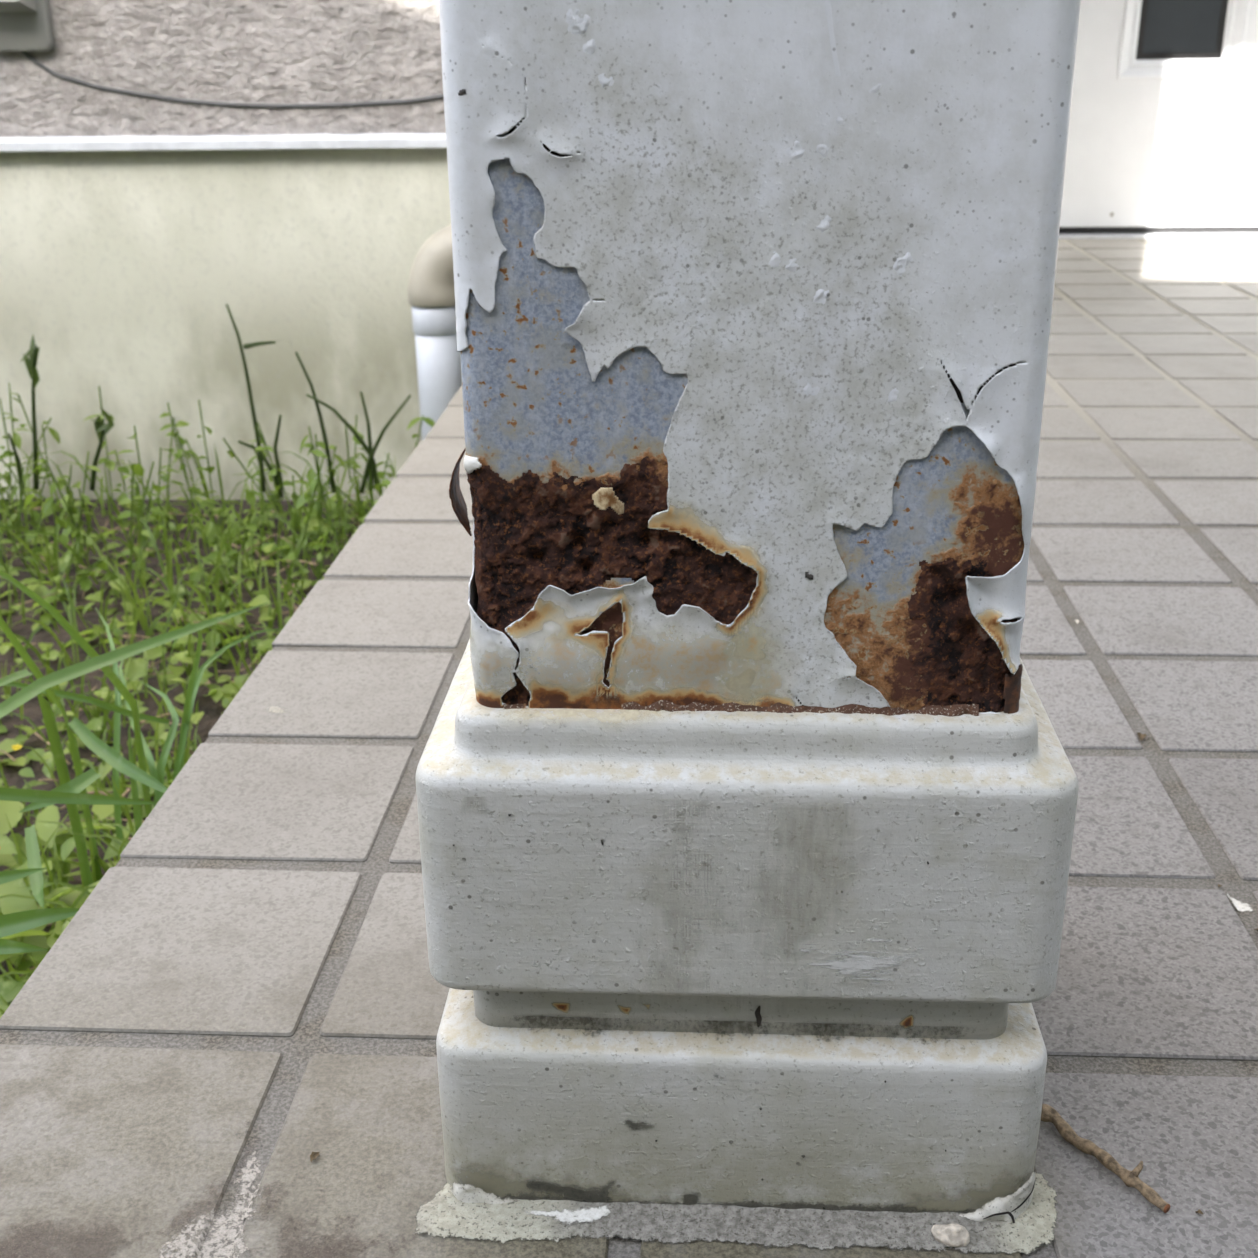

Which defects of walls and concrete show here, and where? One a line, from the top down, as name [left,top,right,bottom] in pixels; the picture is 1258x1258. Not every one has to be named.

peeling [449,158,758,706]
crack [941,360,1026,403]
rust [475,506,979,717]
peeling [824,403,1024,714]
rust [976,610,1016,673]